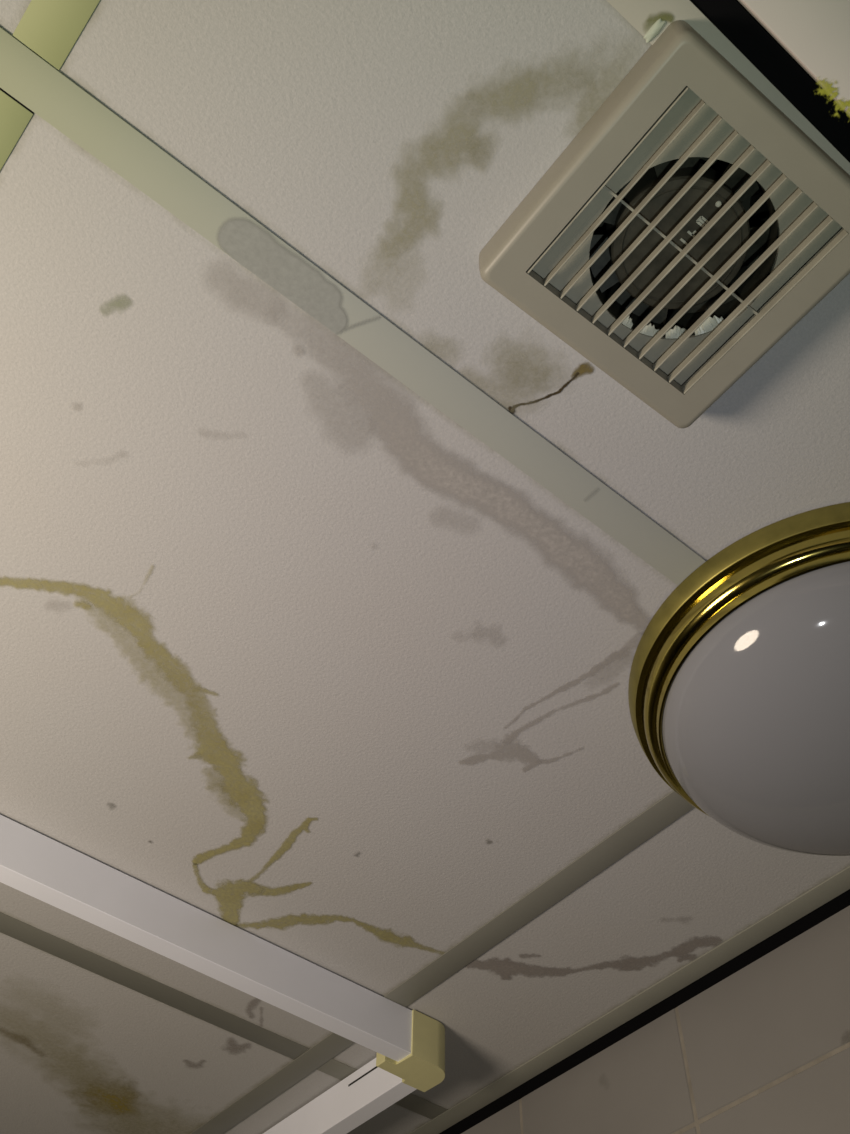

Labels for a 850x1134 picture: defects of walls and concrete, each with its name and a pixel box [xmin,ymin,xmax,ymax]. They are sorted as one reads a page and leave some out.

damp [647,14,673,25]
damp [218,219,380,334]
damp [336,352,650,629]
damp [0,578,441,953]
damp [460,646,630,772]
damp [466,938,721,980]